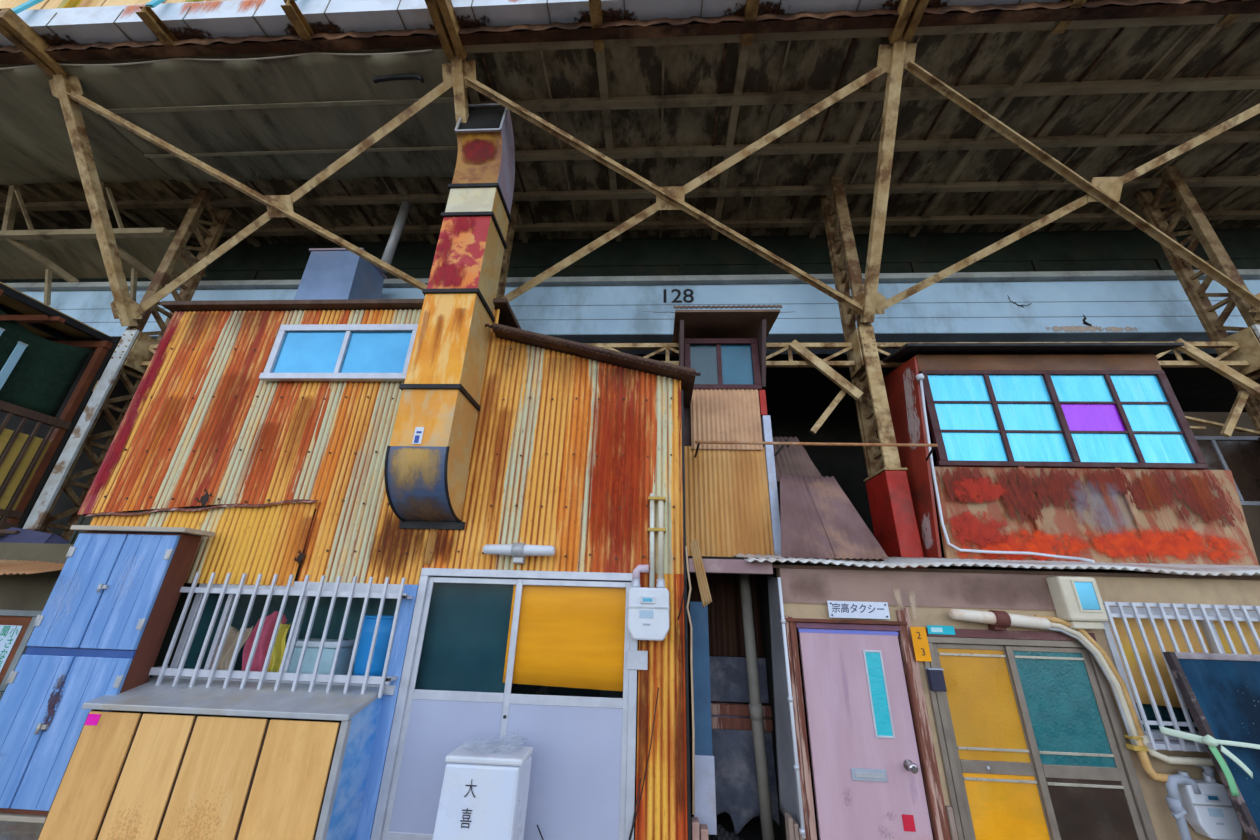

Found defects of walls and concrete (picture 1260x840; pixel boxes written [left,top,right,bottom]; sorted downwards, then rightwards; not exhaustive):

corrosion [462,133,496,164]
corrosion [431,217,474,287]
corrosion [91,325,177,492]
corrosion [370,447,454,574]
corrosion [591,385,646,544]
corrosion [640,670,648,773]
corrosion [675,630,684,812]